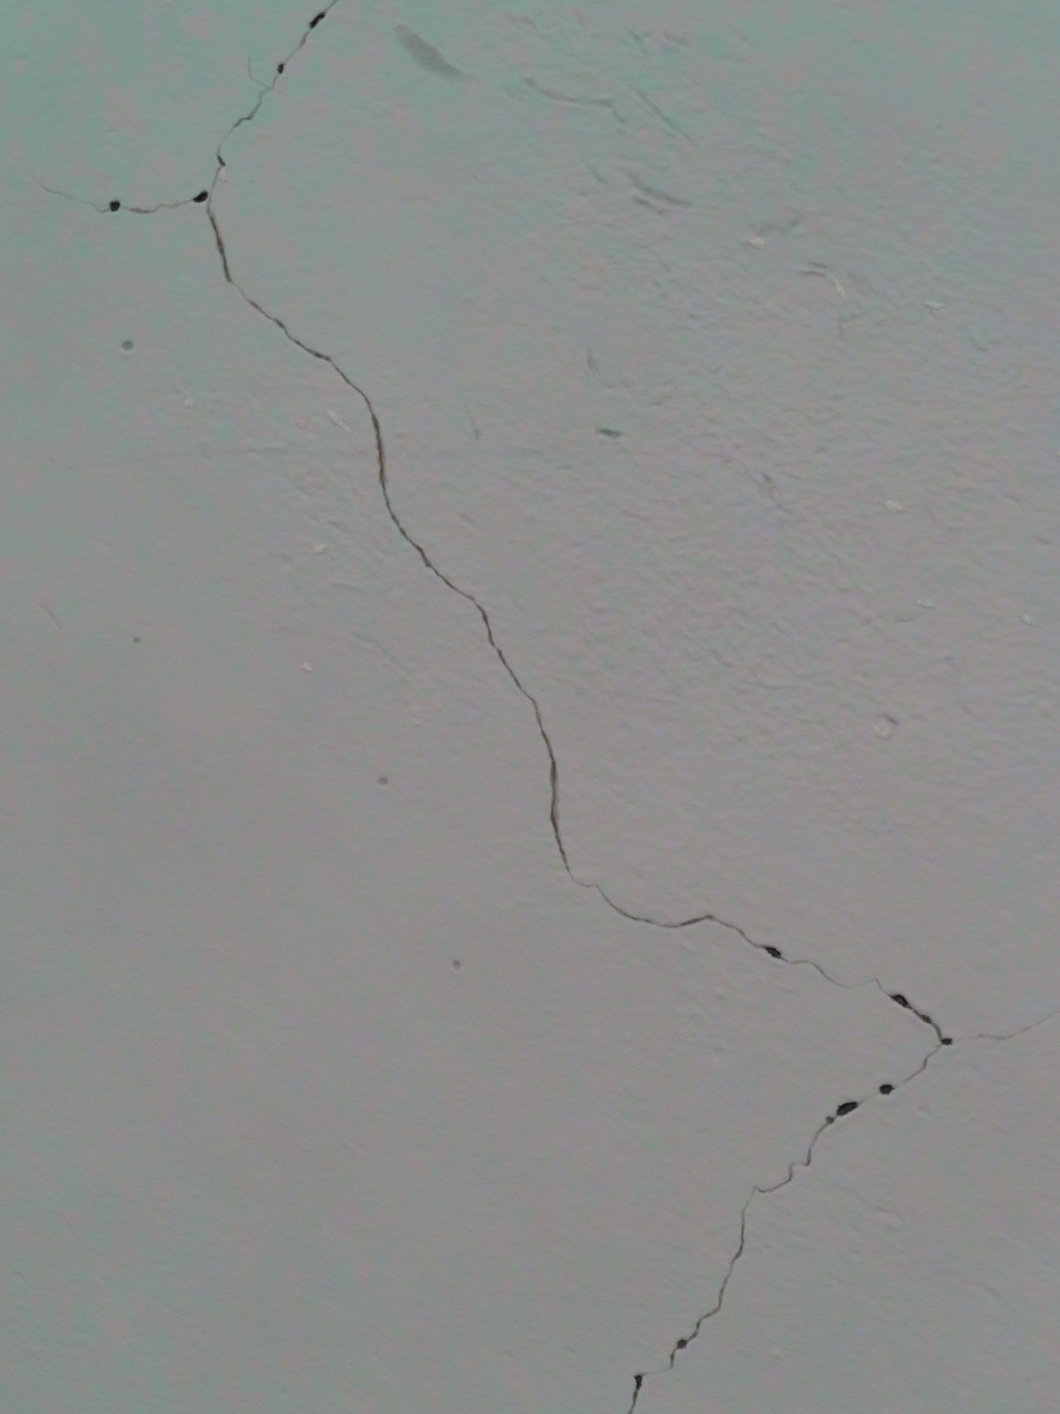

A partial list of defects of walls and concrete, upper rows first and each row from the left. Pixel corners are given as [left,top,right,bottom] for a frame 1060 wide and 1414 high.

crack [310,13,325,28]
crack [110,202,120,212]
crack [193,157,227,271]
crack [252,303,564,854]
crack [761,946,783,959]
crack [890,995,952,1045]
crack [827,1084,894,1123]
crack [671,1291,722,1360]
crack [633,1375,642,1405]